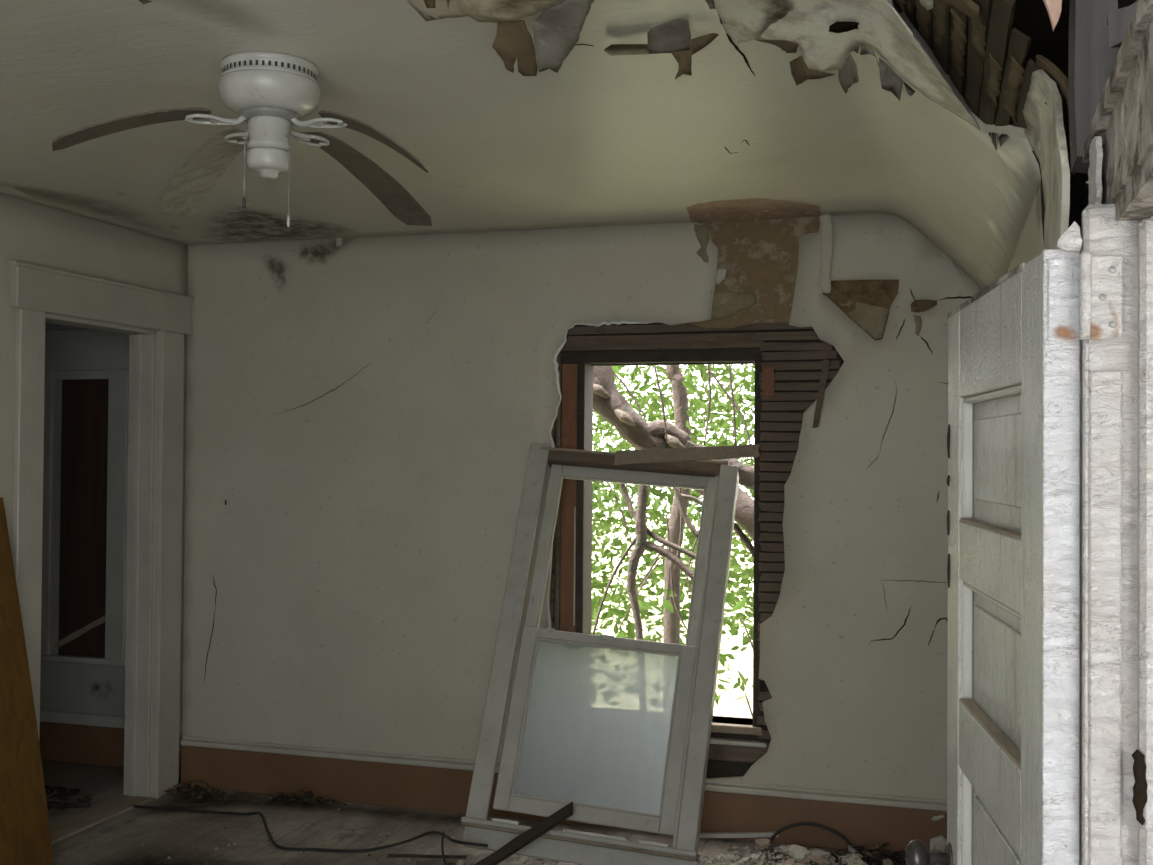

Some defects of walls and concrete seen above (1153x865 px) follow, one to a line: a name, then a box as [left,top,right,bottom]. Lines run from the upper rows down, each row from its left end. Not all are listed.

peeling [604,0,1010,151]
spalling [822,280,899,340]
spalling [911,299,937,336]
crack [896,260,971,354]
spalling [549,198,841,657]
crack [868,383,897,468]
crack [869,580,948,646]
spalling [757,692,772,758]